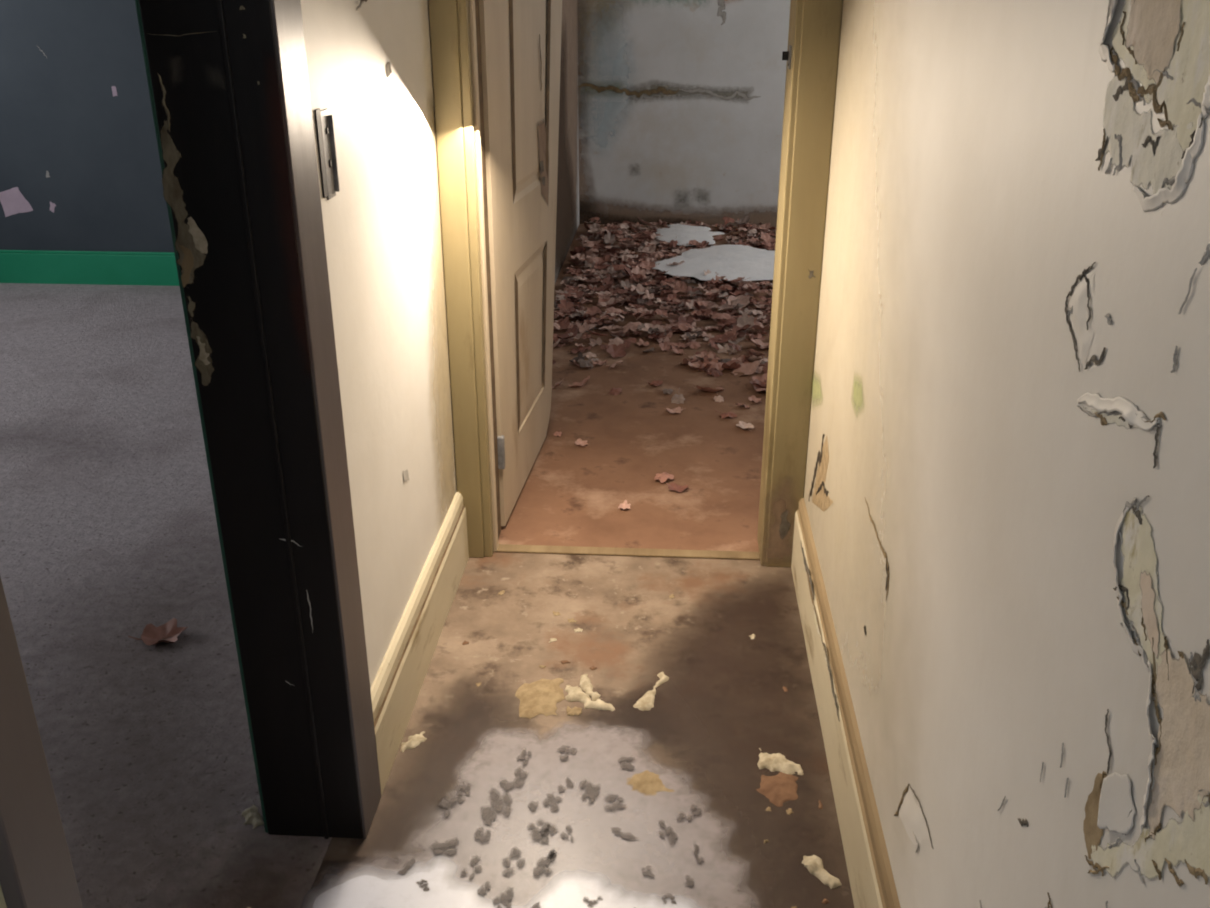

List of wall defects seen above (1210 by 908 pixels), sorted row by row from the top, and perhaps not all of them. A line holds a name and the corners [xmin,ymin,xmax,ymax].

peeling [157,73,214,386]
peeling [1095,0,1210,212]
peeling [1077,393,1166,468]
water stain [368,690,514,861]
water stain [586,582,843,908]
flaking render [1083,495,1210,886]